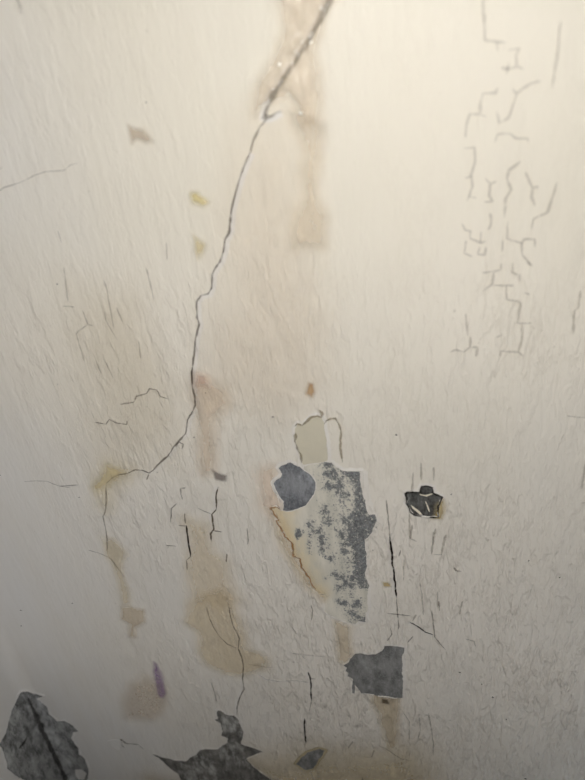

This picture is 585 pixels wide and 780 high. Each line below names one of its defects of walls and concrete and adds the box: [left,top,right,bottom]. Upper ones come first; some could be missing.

crack [259,0,331,123]
crack [106,152,255,485]
crack [183,485,219,557]
peeling [268,411,380,626]
peeling [402,483,446,519]
crack [386,536,397,598]
crack [225,602,245,715]
peeling [341,644,407,700]
peeling [0,689,91,780]
peeling [151,708,274,780]
peeling [293,747,328,772]